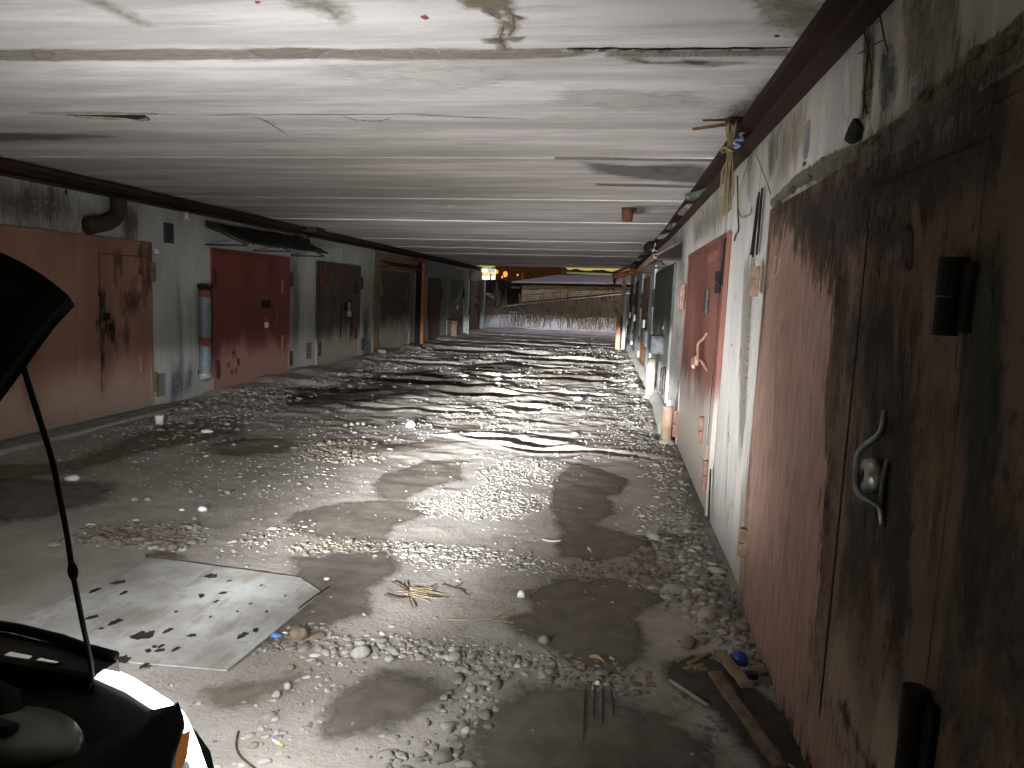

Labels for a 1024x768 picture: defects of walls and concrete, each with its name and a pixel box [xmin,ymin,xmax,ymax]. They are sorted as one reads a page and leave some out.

damp [0,0,789,65]
crack [227,113,527,154]
damp [803,119,811,159]
damp [586,163,705,183]